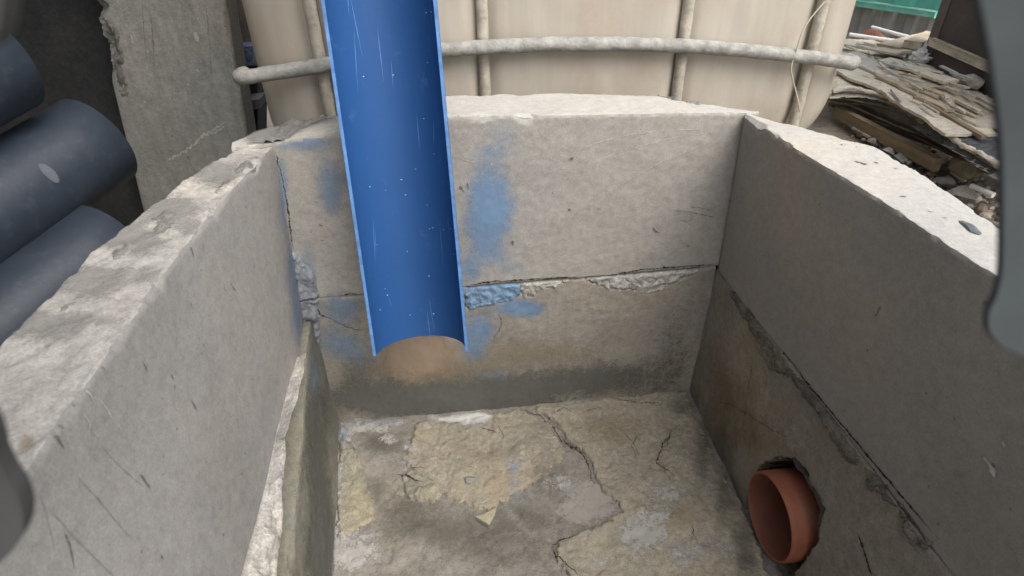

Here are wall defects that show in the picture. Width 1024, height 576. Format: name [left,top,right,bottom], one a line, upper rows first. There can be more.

crack [275,151,293,246]
spalling [292,252,322,349]
spalling [465,268,698,310]
crack [526,398,663,484]
crack [628,427,677,478]
crack [783,352,937,537]
crack [553,536,578,575]
crack [858,534,872,576]